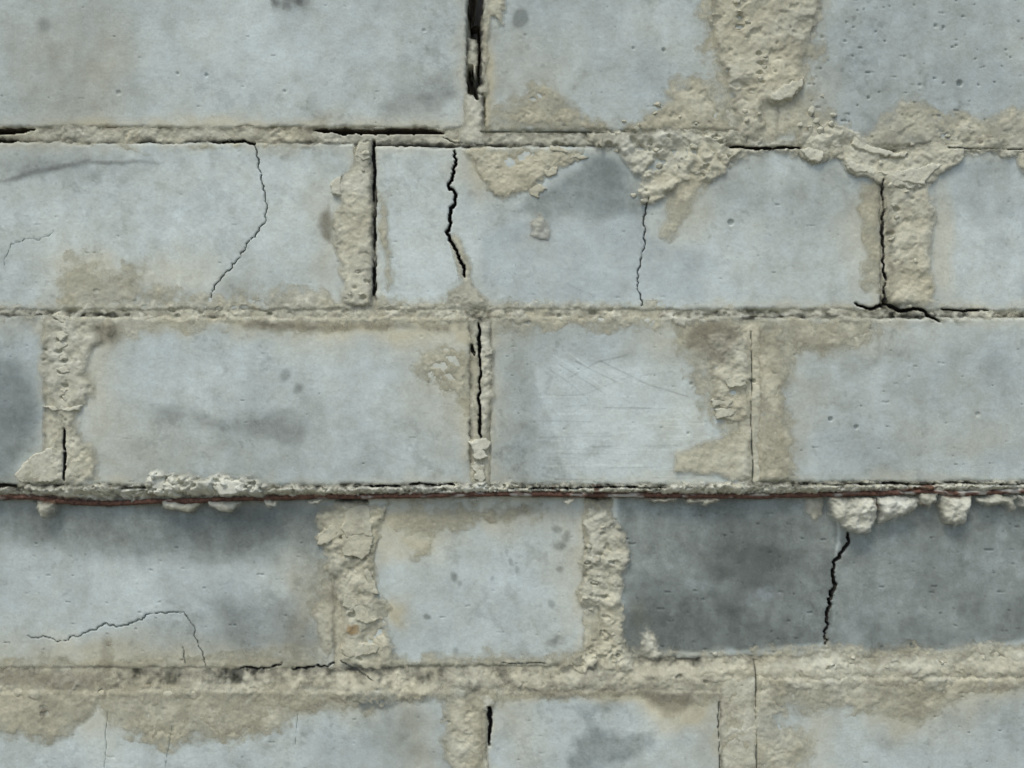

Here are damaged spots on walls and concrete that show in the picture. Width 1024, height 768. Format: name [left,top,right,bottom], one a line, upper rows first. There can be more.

peeling [330,141,374,305]
crack [370,141,378,295]
crack [445,152,466,276]
peeling [465,145,588,198]
peeling [588,0,1024,306]
crack [854,179,986,322]
peeling [15,311,170,503]
crack [470,323,482,437]
peeling [315,488,407,669]
peeling [557,328,1024,679]
crack [823,533,850,644]
crack [485,706,493,745]